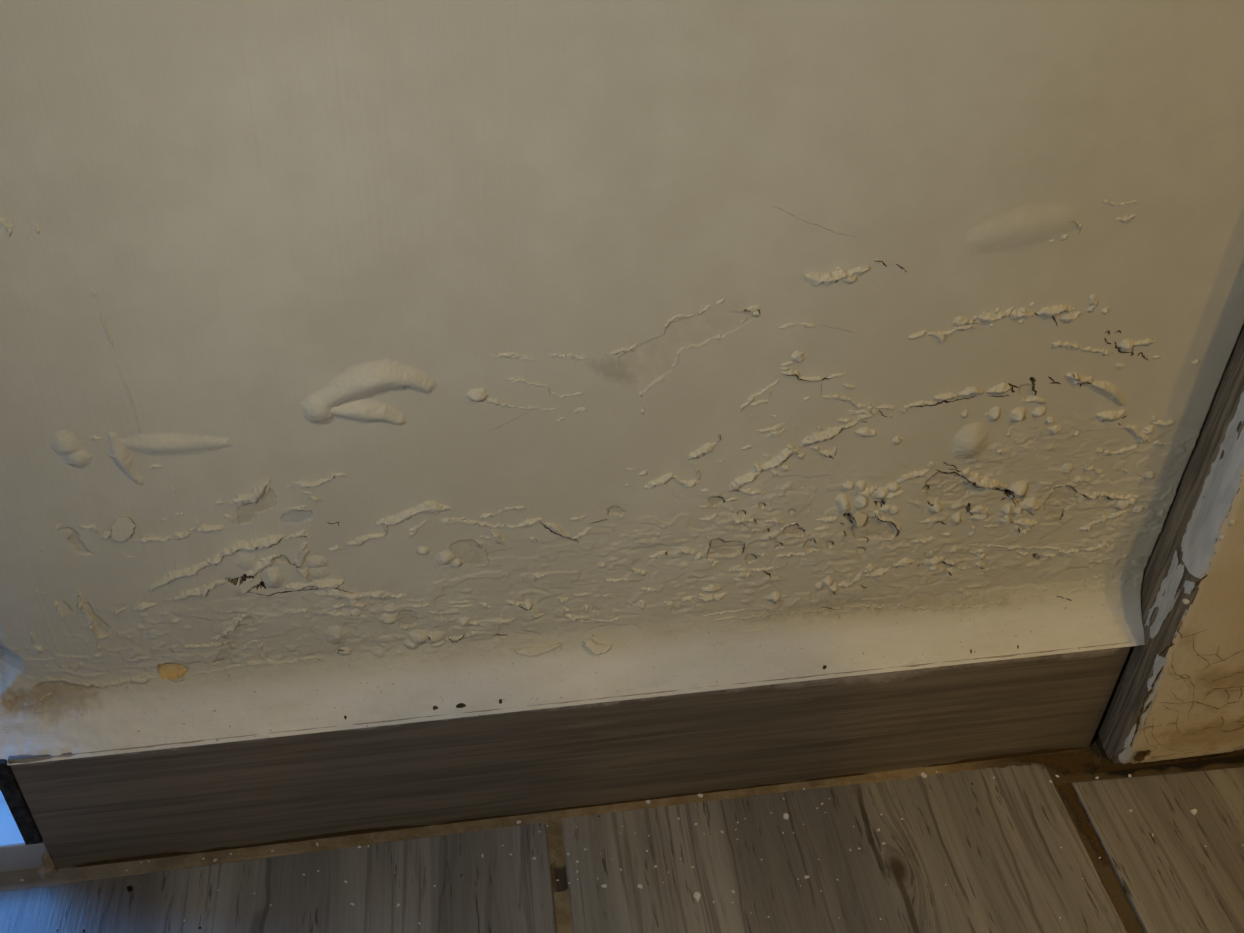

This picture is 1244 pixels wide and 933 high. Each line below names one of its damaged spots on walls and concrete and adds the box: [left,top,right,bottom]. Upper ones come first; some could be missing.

peeling [1051,330,1161,369]
peeling [132,473,346,592]
peeling [558,350,1175,623]
peeling [1144,391,1244,639]
peeling [314,588,544,625]
peeling [158,663,189,682]
peeling [1118,654,1168,764]
crack [1112,621,1244,760]